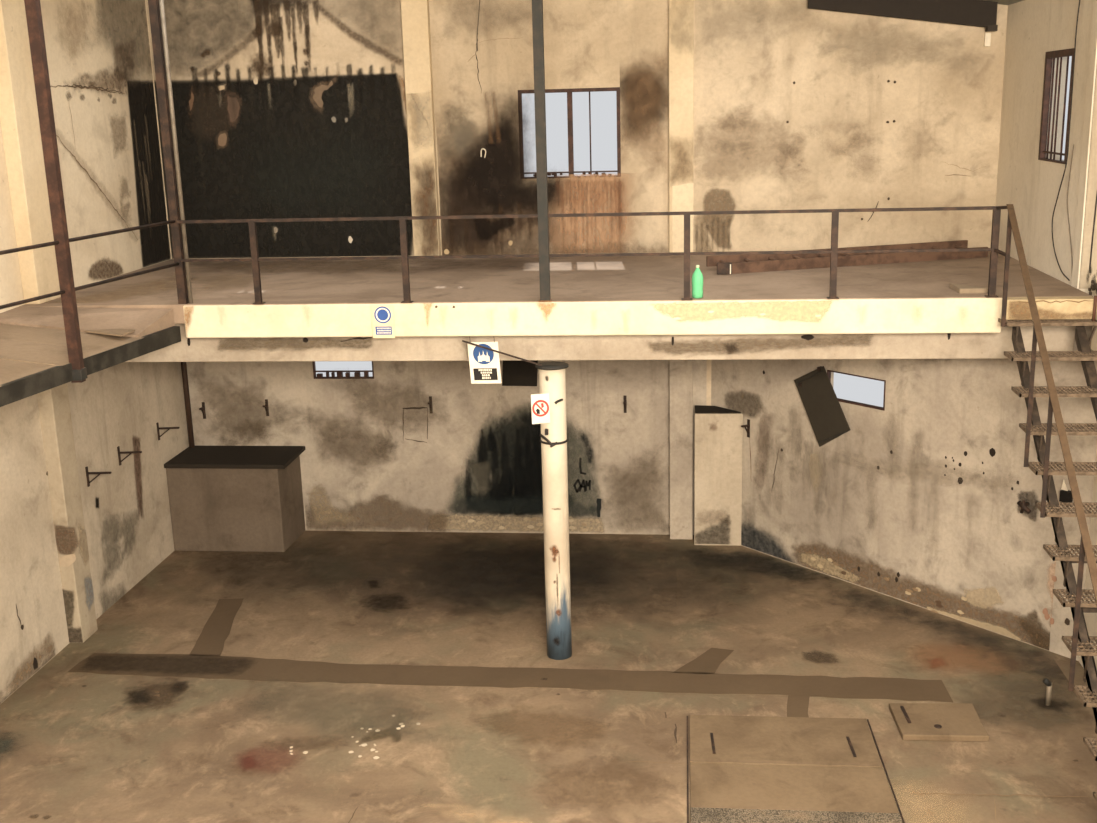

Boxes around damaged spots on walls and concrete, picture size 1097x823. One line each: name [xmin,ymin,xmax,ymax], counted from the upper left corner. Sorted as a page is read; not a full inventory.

leakage [254,0,318,68]
leakage [697,189,735,250]
peeling [655,300,831,340]
leakage [974,651,1075,727]